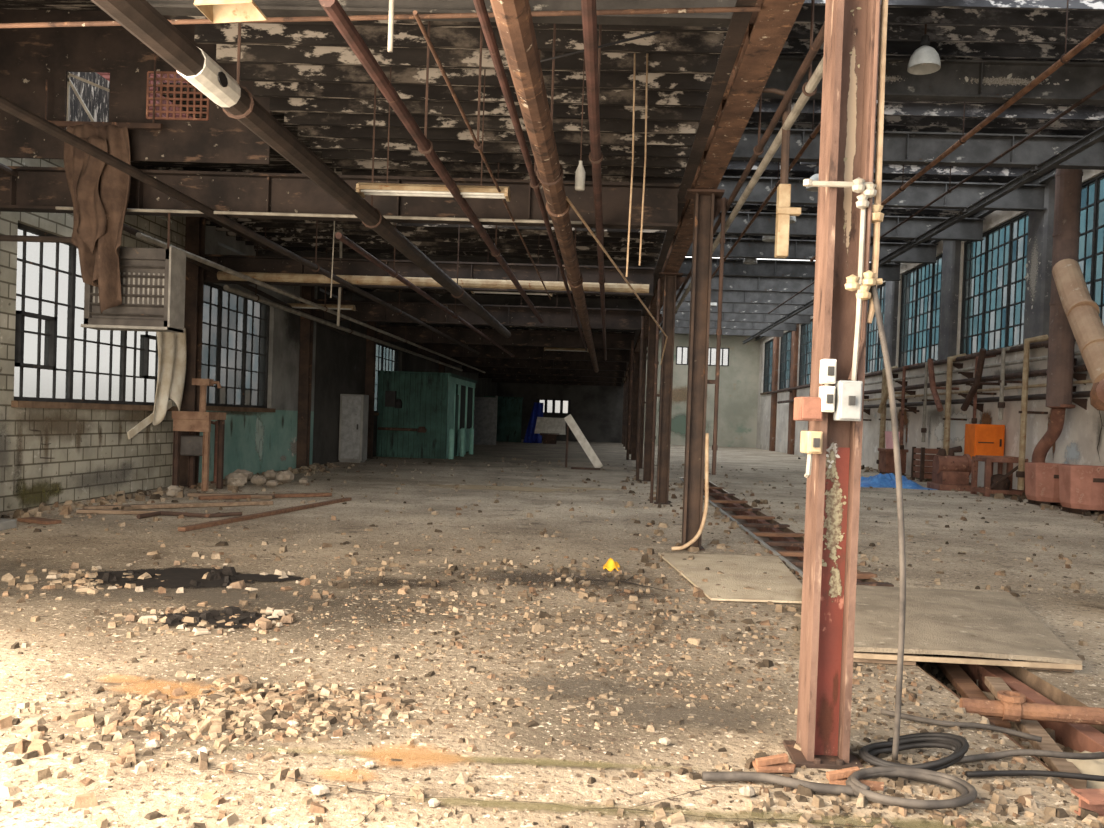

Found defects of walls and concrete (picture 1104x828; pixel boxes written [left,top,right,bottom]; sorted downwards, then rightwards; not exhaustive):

peeling [959,73,1069,87]
damp [119,412,151,443]
peeling [822,439,846,602]
rust [818,676,838,745]